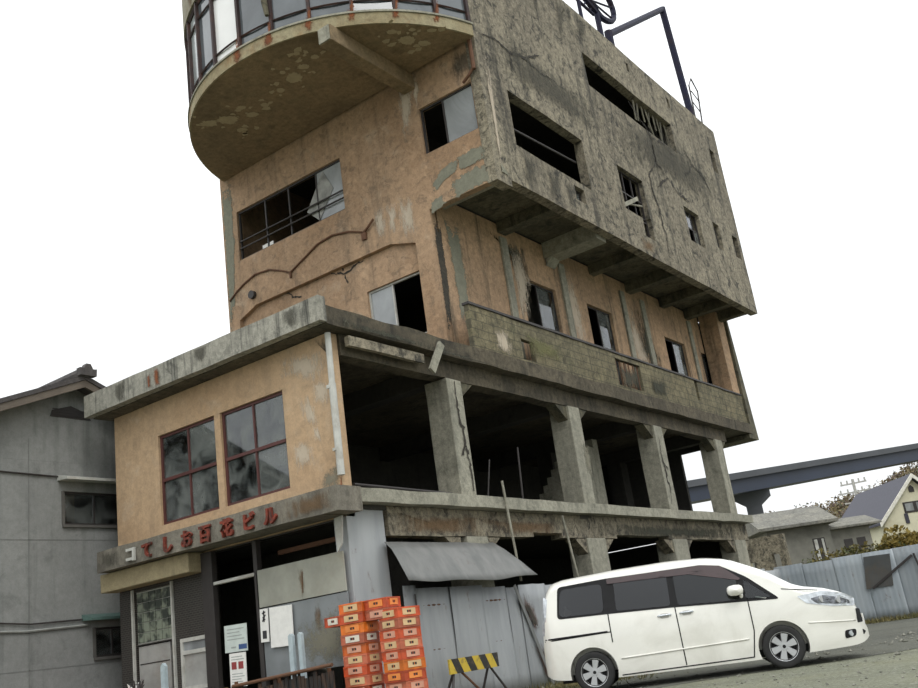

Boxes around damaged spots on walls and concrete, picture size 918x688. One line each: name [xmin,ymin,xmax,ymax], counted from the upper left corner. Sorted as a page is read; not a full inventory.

leakage [557,5,591,36]
peeling [193,47,326,138]
peeling [488,75,501,155]
leakage [506,51,589,121]
peeling [431,146,490,330]
crack [286,261,363,298]